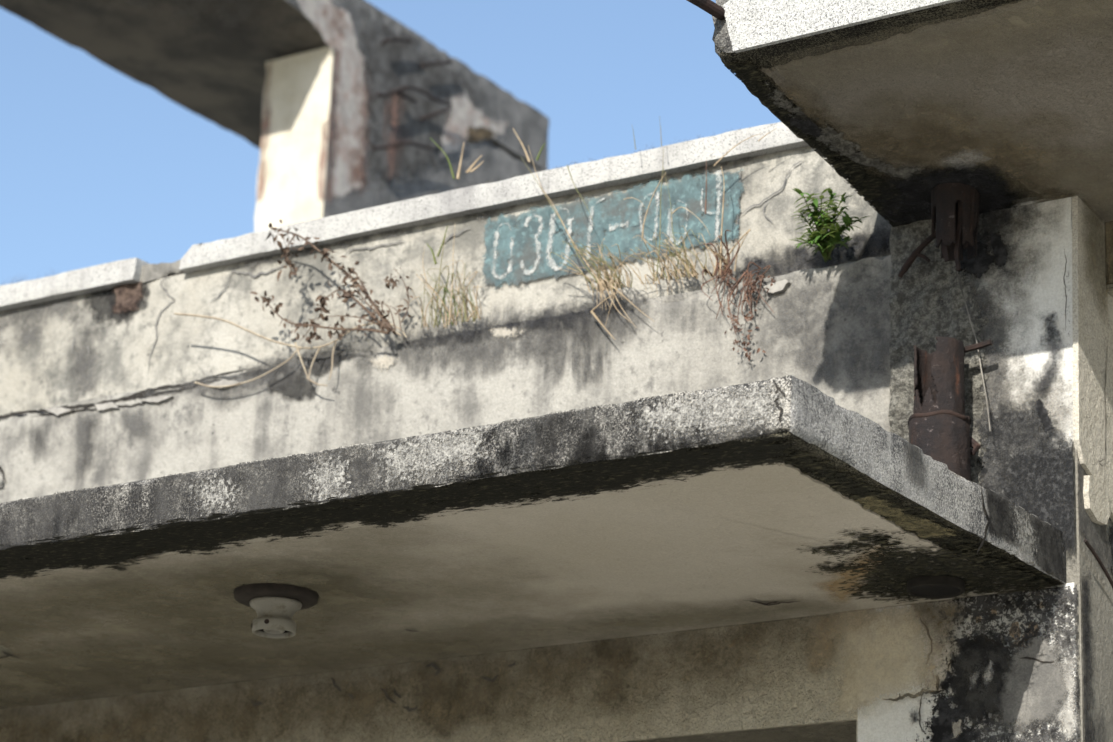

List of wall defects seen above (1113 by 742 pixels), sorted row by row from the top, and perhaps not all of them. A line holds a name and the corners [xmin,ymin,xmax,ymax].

spalling [297,0,508,198]
damp [0,296,99,391]
spalling [85,281,149,323]
crack [0,270,252,420]
damp [389,295,645,383]
damp [728,88,1072,392]
damp [0,313,1113,742]